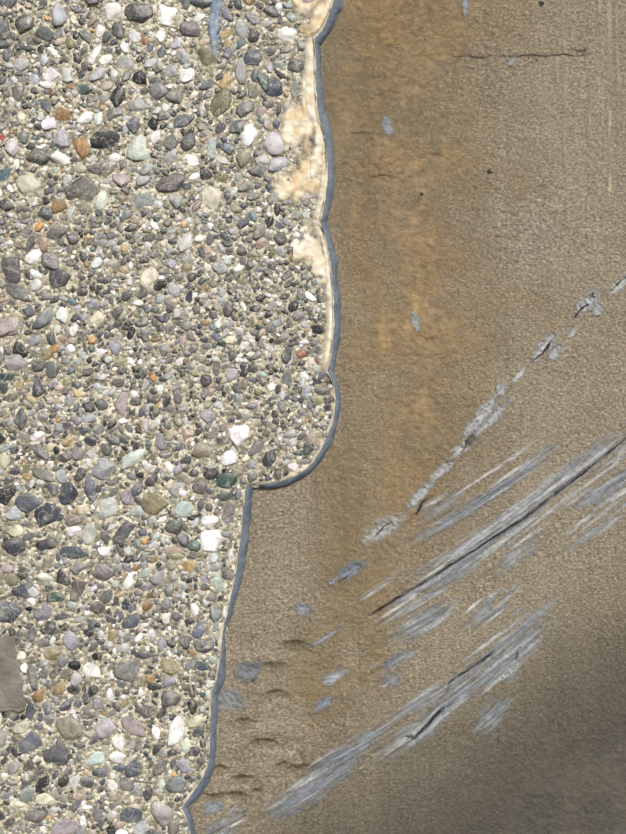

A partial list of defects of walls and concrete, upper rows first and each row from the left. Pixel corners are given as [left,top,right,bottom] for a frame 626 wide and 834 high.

crack [370,437,626,616]
crack [406,652,493,744]